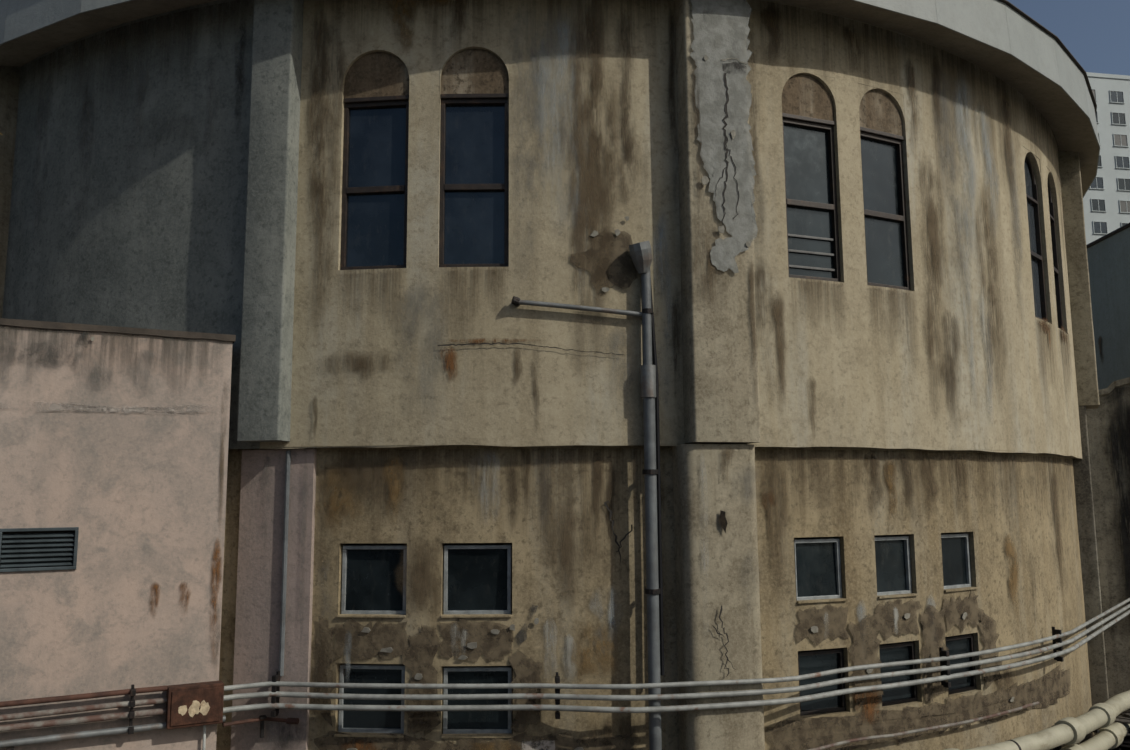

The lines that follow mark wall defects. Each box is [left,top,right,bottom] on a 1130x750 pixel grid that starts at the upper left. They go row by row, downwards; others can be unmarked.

leakage [572,11,632,295]
peeling [690,0,758,273]
crack [715,73,739,225]
rust [438,339,623,397]
spalling [570,216,637,292]
leakage [750,267,785,386]
leakage [921,169,958,399]
rust [211,543,221,623]
crack [604,501,633,566]
leakage [792,449,1015,510]
spalling [311,605,638,750]
spalling [764,590,1071,750]